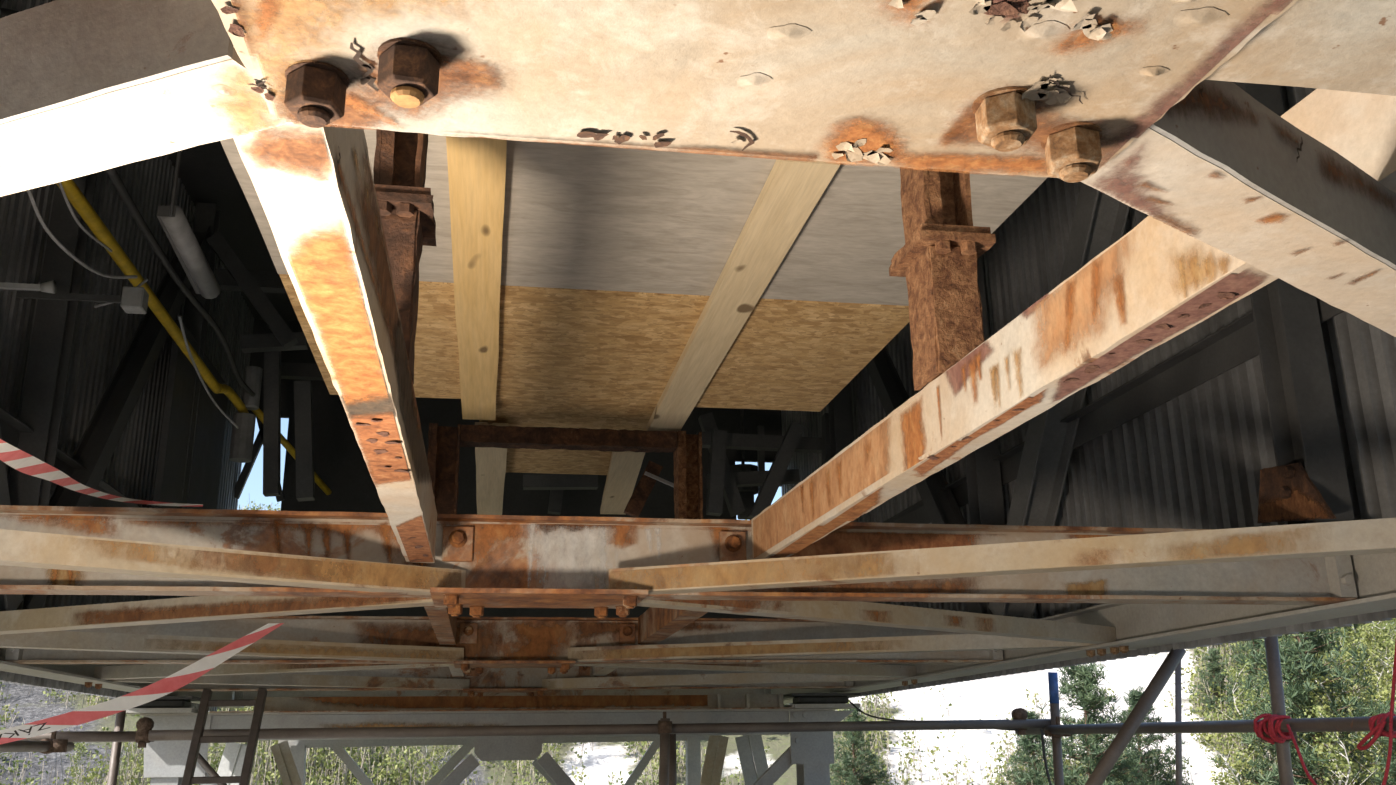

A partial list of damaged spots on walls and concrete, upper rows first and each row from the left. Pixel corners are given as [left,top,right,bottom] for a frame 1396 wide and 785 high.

peeling [966,0,1131,53]
peeling [1022,75,1083,105]
rust [481,0,1291,236]
rust [217,0,499,431]
rust [621,342,1021,609]
rust [18,514,158,562]
rust [1181,487,1328,560]
rust [48,569,82,586]
rust [77,518,449,625]
rust [1067,559,1105,595]
rust [192,622,880,669]